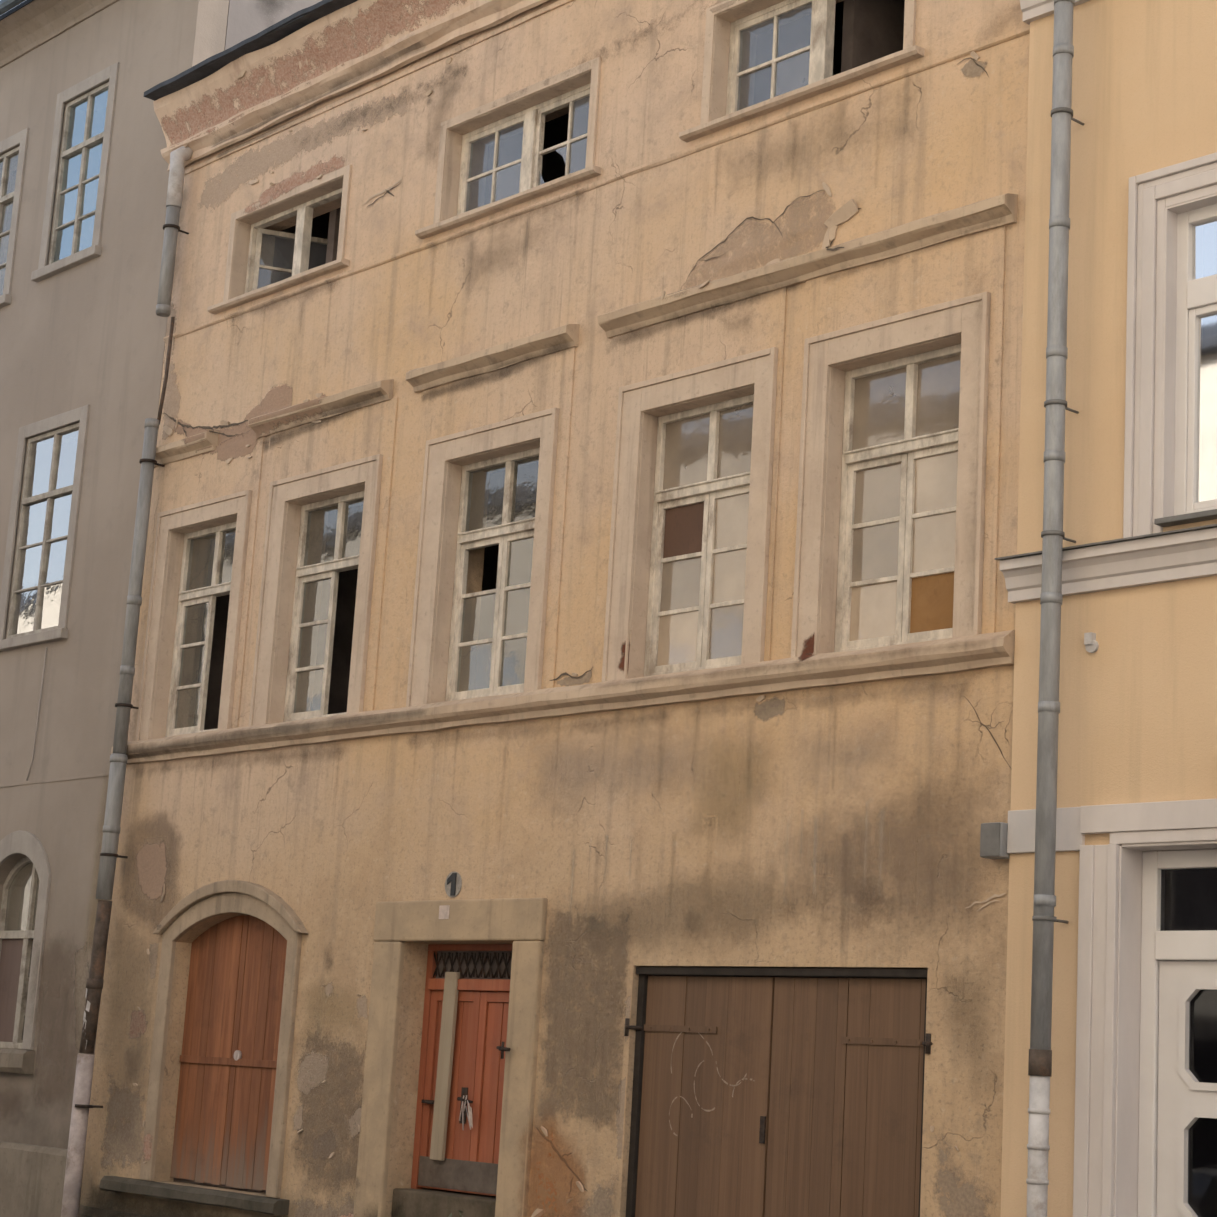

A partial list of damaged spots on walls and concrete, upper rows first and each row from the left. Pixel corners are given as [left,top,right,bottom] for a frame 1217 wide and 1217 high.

flaking render [161,0,465,147]
flaking render [163,303,325,464]
crack [964,696,1012,770]
flaking render [136,842,167,902]
leakage [543,914,626,1122]